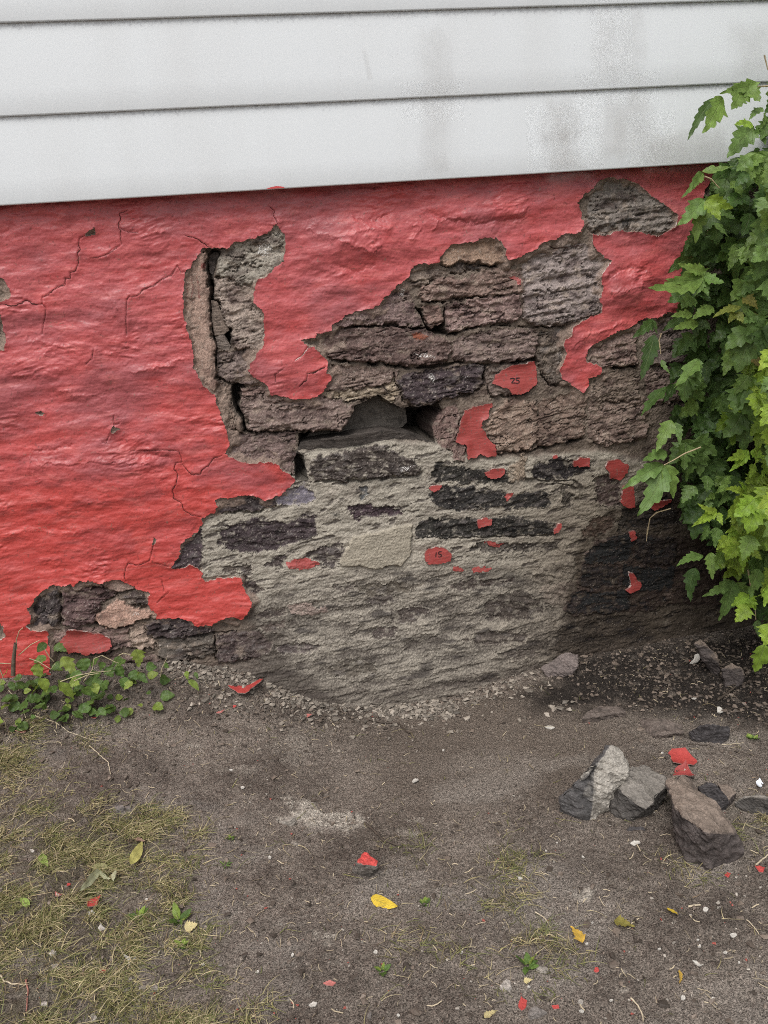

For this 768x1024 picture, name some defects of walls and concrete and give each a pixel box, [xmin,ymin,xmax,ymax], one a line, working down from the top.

crack [0,212,136,333]
crack [138,450,220,517]
spalling [26,177,767,714]